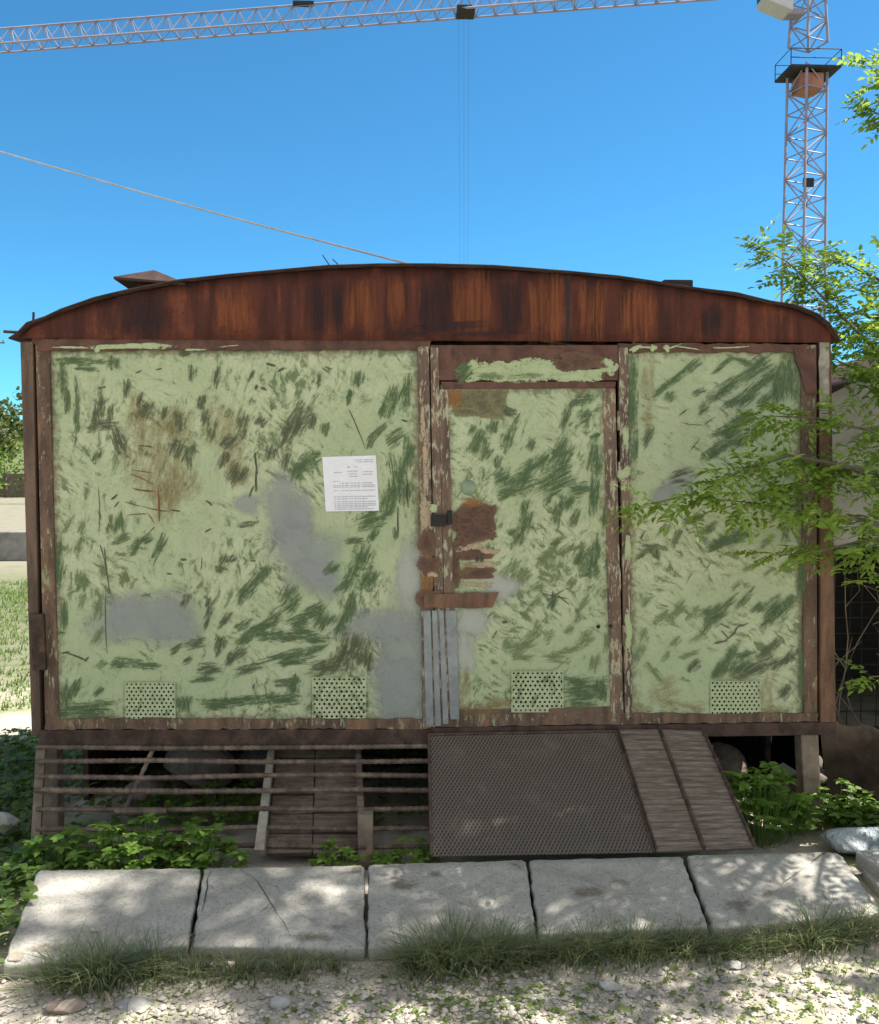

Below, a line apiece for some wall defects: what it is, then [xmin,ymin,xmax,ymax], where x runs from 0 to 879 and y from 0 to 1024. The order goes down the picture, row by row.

peeling [97,657,160,669]
peeling [170,365,438,713]
peeling [450,342,807,712]
crack [239,868,290,935]